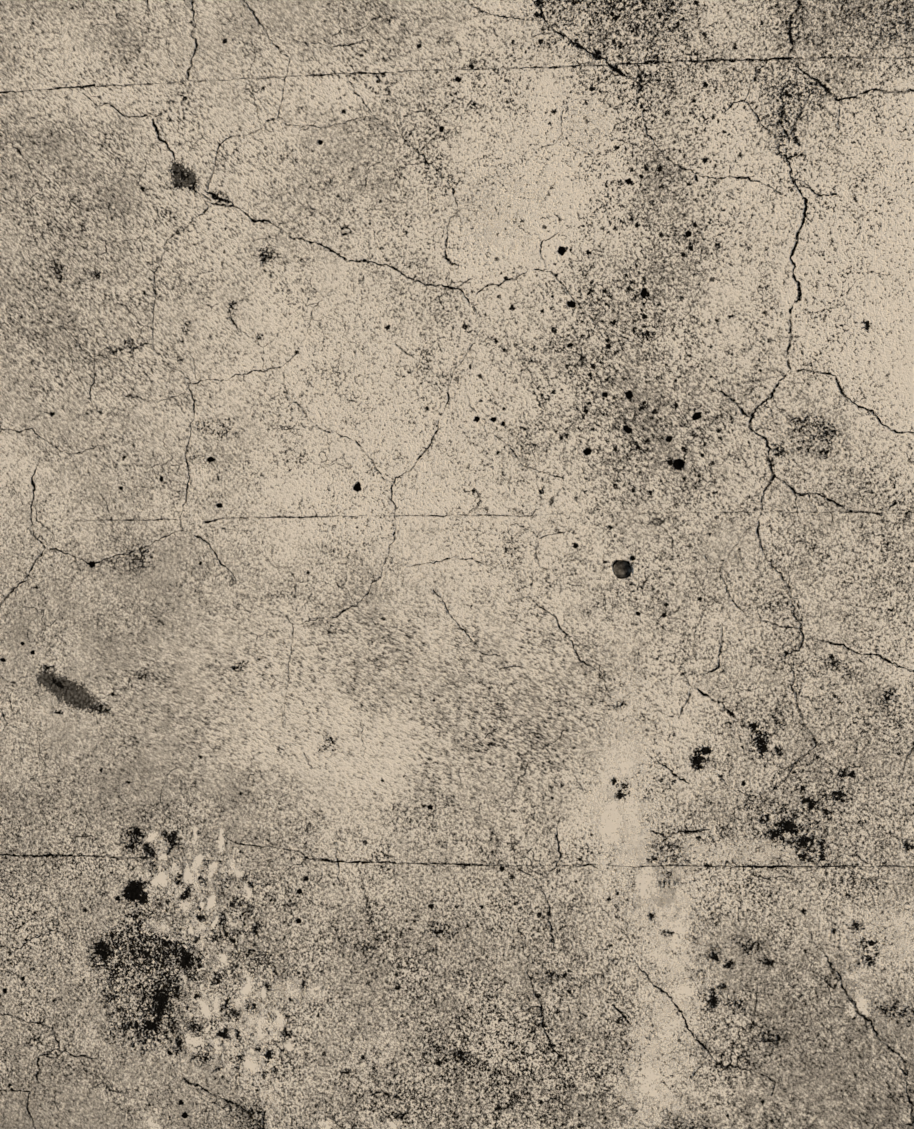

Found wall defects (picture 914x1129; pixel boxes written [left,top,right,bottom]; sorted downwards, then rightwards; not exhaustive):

water stain [168,158,230,203]
crack [0,0,638,724]
crack [642,0,914,797]
water stain [31,665,113,717]
crack [0,1014,95,1129]
water stain [88,826,332,1067]
water stain [338,1012,473,1078]
crack [514,971,560,1069]
crack [518,816,598,947]
crack [651,819,710,866]
crack [597,901,776,1096]
crack [804,926,914,1123]